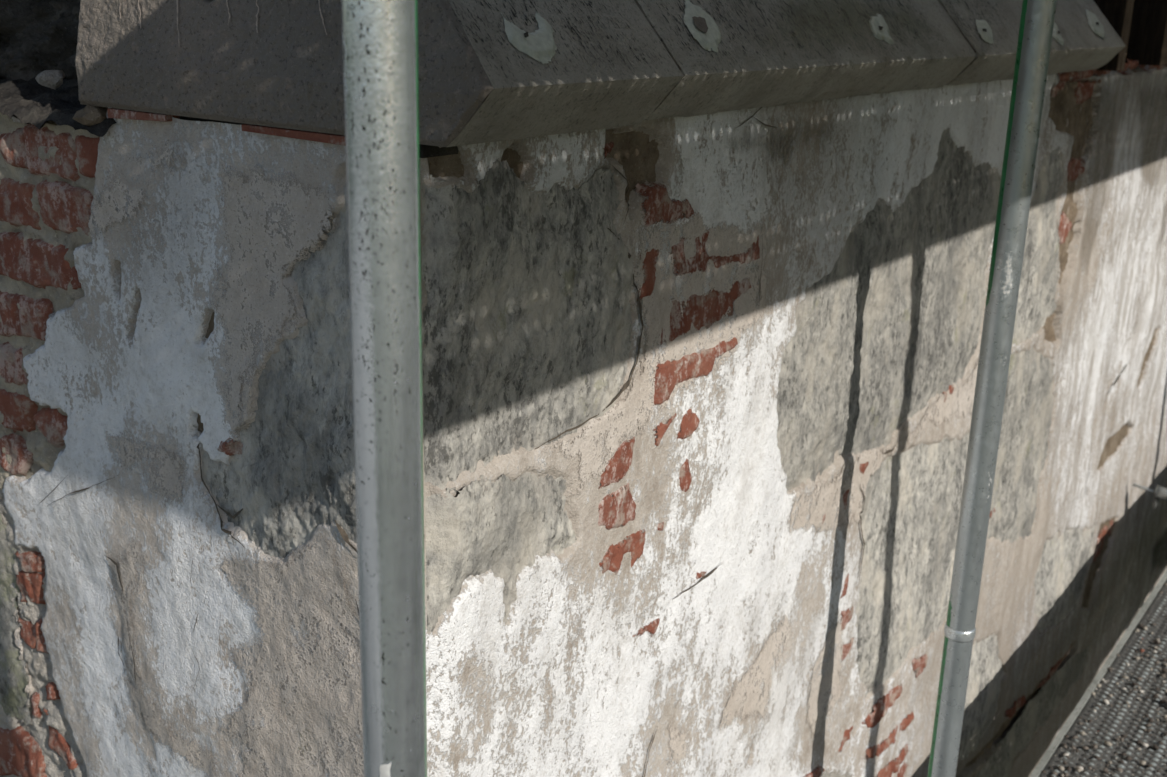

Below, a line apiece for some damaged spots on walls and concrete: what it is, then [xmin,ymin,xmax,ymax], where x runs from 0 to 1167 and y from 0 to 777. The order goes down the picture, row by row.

flaking render [1050,59,1166,105]
crack [535,165,644,449]
flaking render [421,129,769,637]
spalling [1137,329,1157,388]
flaking render [0,112,183,777]
crack [197,444,244,547]
flaking render [776,128,1001,752]
flaking render [804,764,852,777]
flaking render [865,710,914,777]